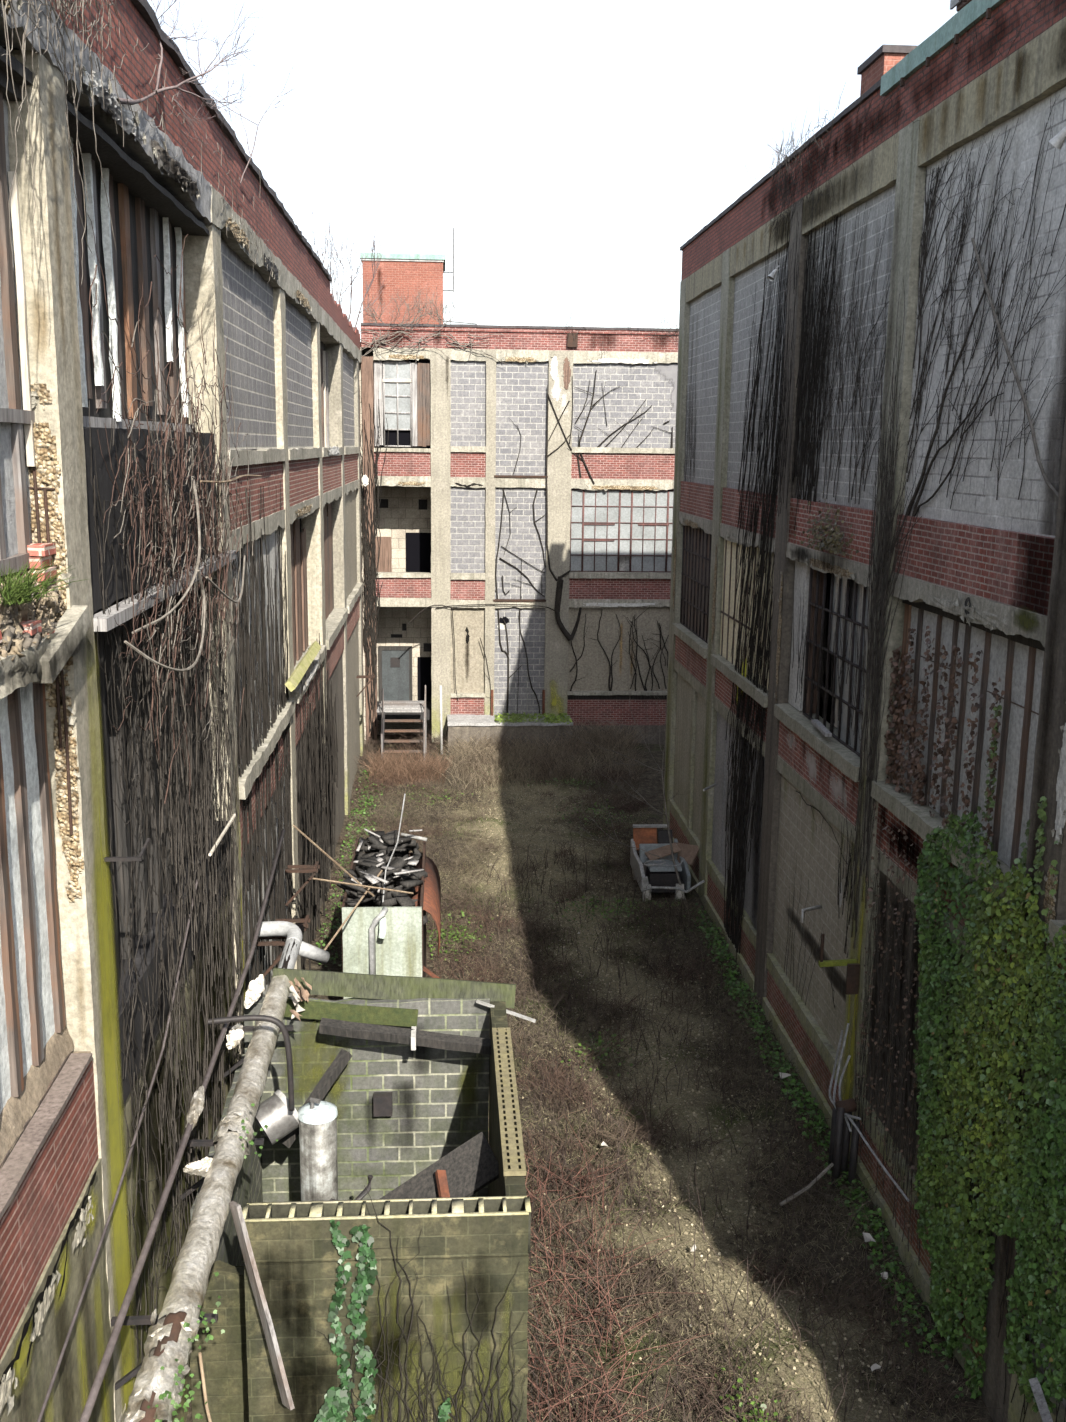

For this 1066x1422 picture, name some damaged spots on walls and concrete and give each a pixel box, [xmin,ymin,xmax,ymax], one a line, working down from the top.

damp [1016,340,1066,616]
damp [94,767,245,1411]
damp [289,1355,330,1422]
damp [363,1323,410,1385]